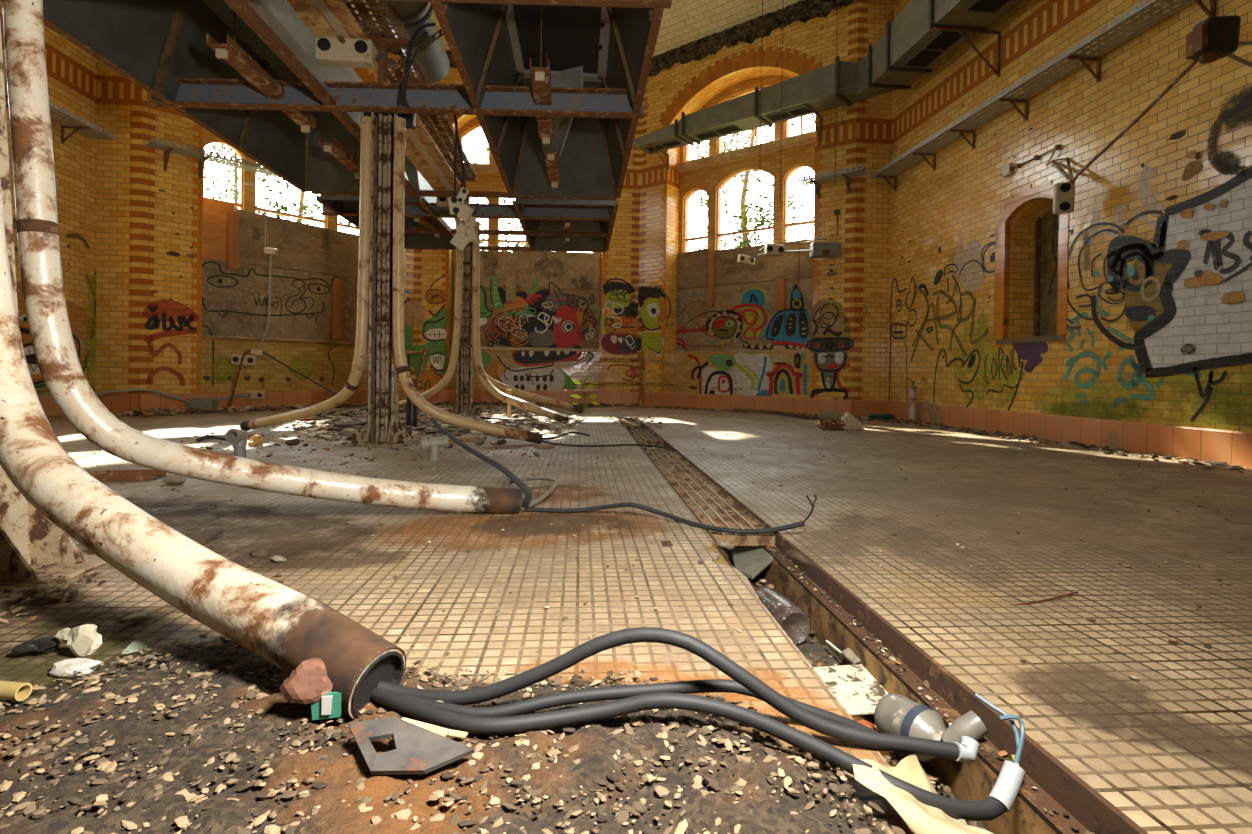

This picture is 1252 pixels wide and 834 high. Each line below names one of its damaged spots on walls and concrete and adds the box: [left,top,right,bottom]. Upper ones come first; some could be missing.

peeling [1166,195,1227,218]
peeling [1177,230,1230,250]
peeling [1184,270,1245,304]